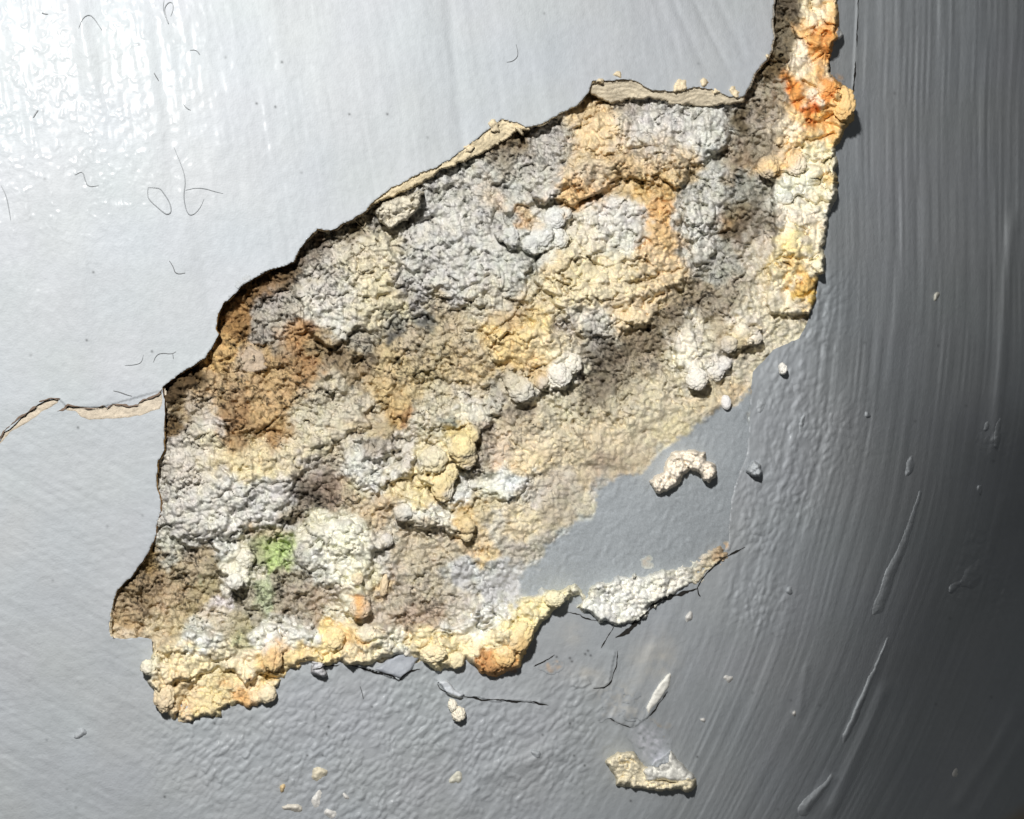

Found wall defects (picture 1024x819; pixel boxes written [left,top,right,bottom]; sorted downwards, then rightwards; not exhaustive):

rust [800,9,839,64]
rust [786,68,846,130]
flaking render [109,0,809,651]
water stain [140,0,856,723]
crack [0,387,166,443]
peeling [311,661,327,679]
peeling [375,654,421,678]
peeling [437,680,465,699]
crack [438,685,547,705]
peeling [605,673,697,793]